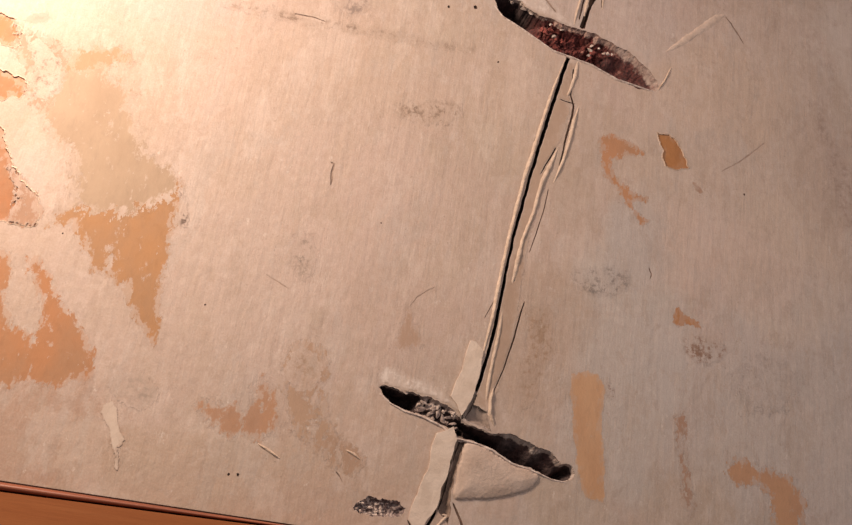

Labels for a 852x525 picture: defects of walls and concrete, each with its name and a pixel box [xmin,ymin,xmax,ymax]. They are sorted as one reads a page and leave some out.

crack [573,0,605,29]
peeling [0,12,189,349]
peeling [597,133,650,226]
peeling [657,132,690,171]
peeling [0,249,97,391]
crack [407,54,579,525]
spalling [416,400,458,430]
peeling [569,370,607,503]
peeling [723,454,808,525]